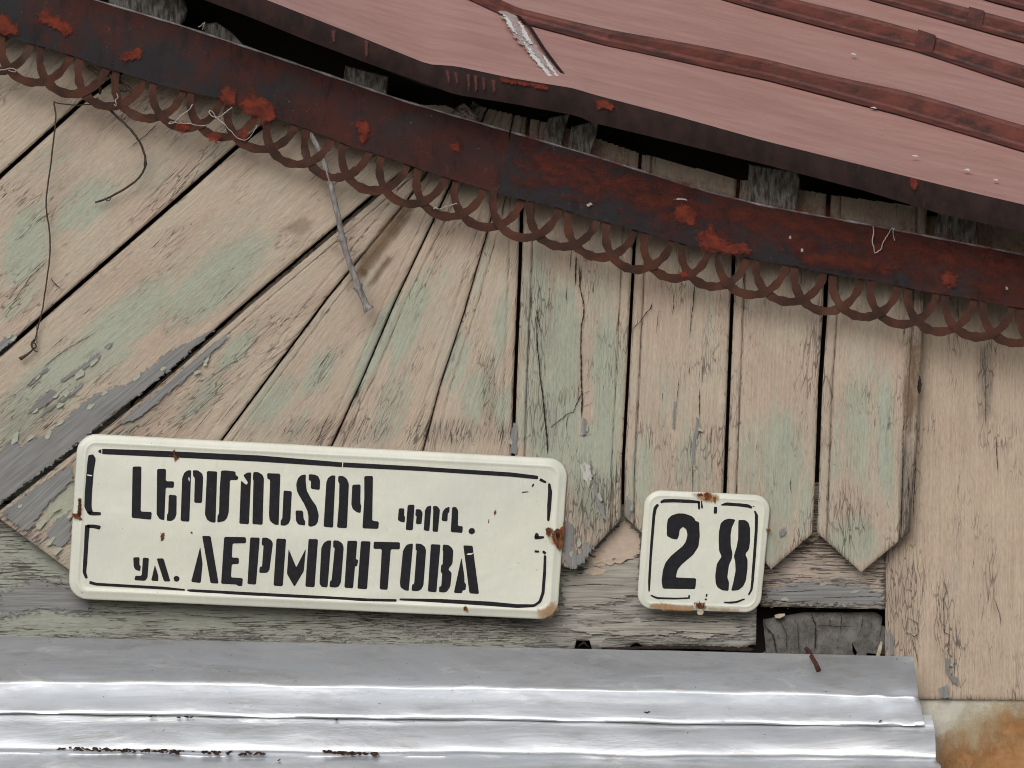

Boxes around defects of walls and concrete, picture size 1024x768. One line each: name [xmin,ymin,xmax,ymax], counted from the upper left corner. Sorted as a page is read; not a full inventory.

rust [0,14,19,36]
rust [36,11,73,36]
rust [220,86,276,125]
rust [500,77,548,90]
rust [512,135,1024,288]
crack [536,250,592,454]
peeling [0,330,229,555]
rust [694,493,718,503]
rust [546,521,566,550]
peeling [560,453,743,641]
crack [905,581,1001,667]
rust [937,712,1024,768]